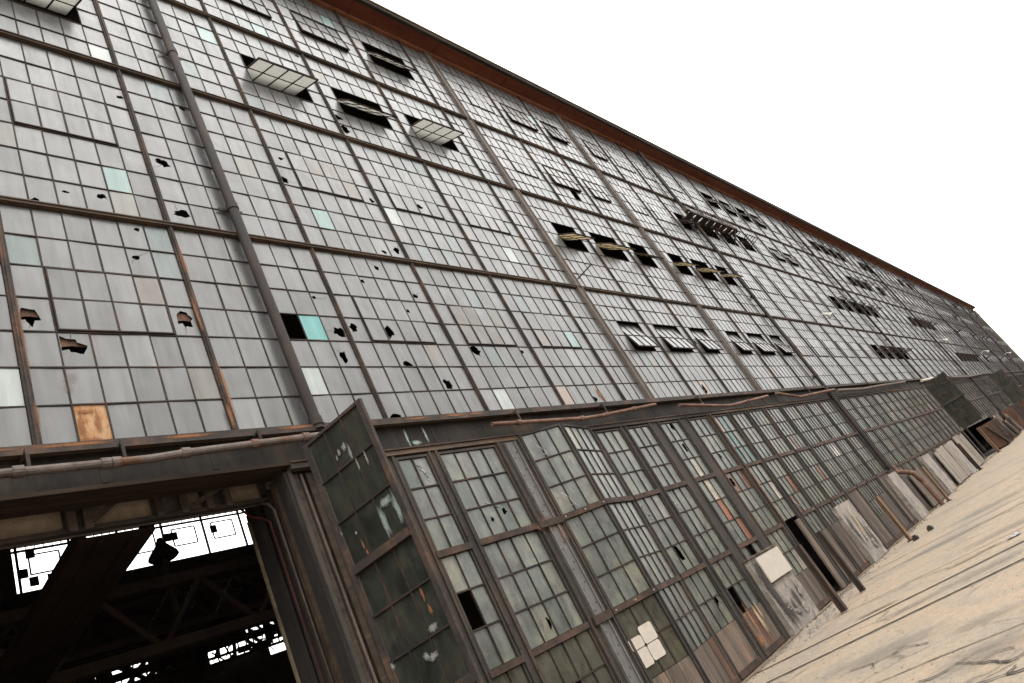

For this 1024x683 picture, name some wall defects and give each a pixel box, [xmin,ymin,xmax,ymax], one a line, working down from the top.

corrosion [45,410,103,448]
peeling [379,494,402,536]